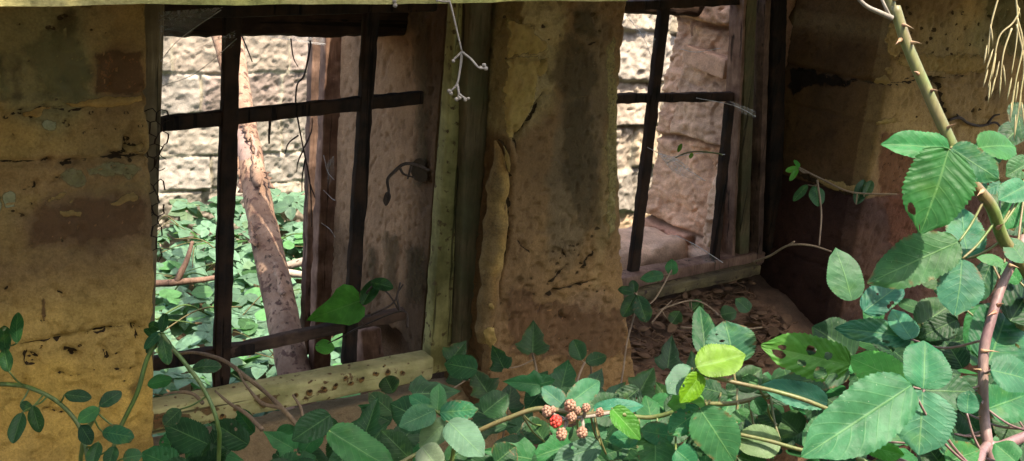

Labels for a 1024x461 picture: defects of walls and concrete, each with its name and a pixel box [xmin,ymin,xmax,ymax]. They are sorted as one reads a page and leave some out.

crack [864,75,964,113]
crack [0,136,139,190]
crack [498,94,542,255]
crack [545,281,588,296]
crack [21,334,61,344]
crack [87,322,140,338]